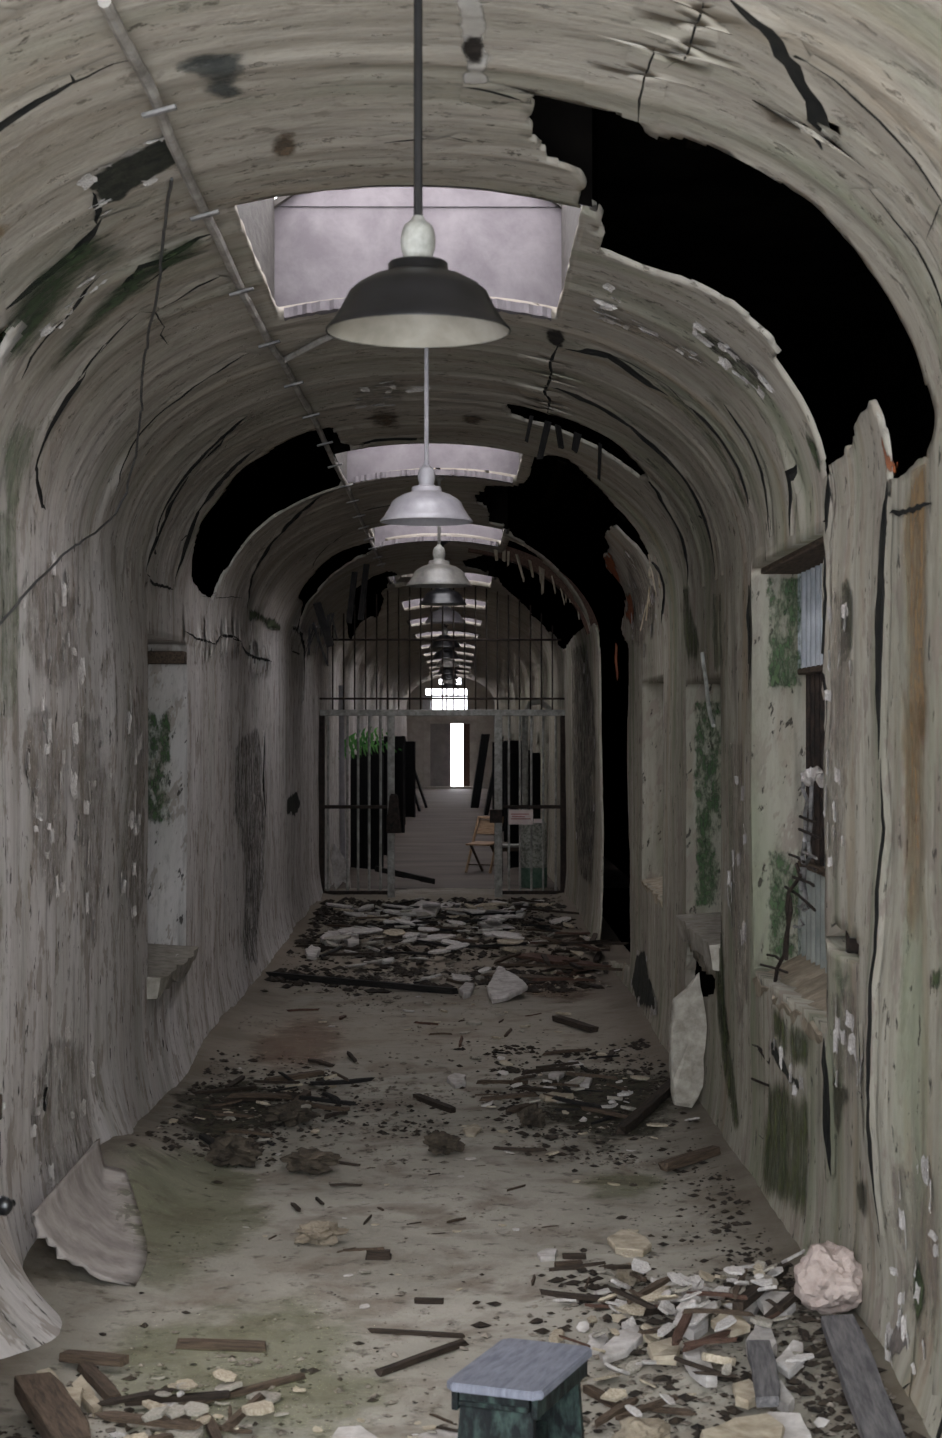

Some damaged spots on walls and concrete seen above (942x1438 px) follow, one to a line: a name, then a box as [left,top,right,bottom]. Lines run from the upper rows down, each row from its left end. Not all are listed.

crack [0,53,131,160]
crack [584,0,942,354]
peeling [593,283,775,399]
spalling [353,469,513,485]
crack [514,337,835,742]
peeling [21,552,86,688]
peeling [26,691,145,942]
crack [820,481,932,1238]
water stain [833,1083,848,1132]
water stain [857,1182,865,1214]